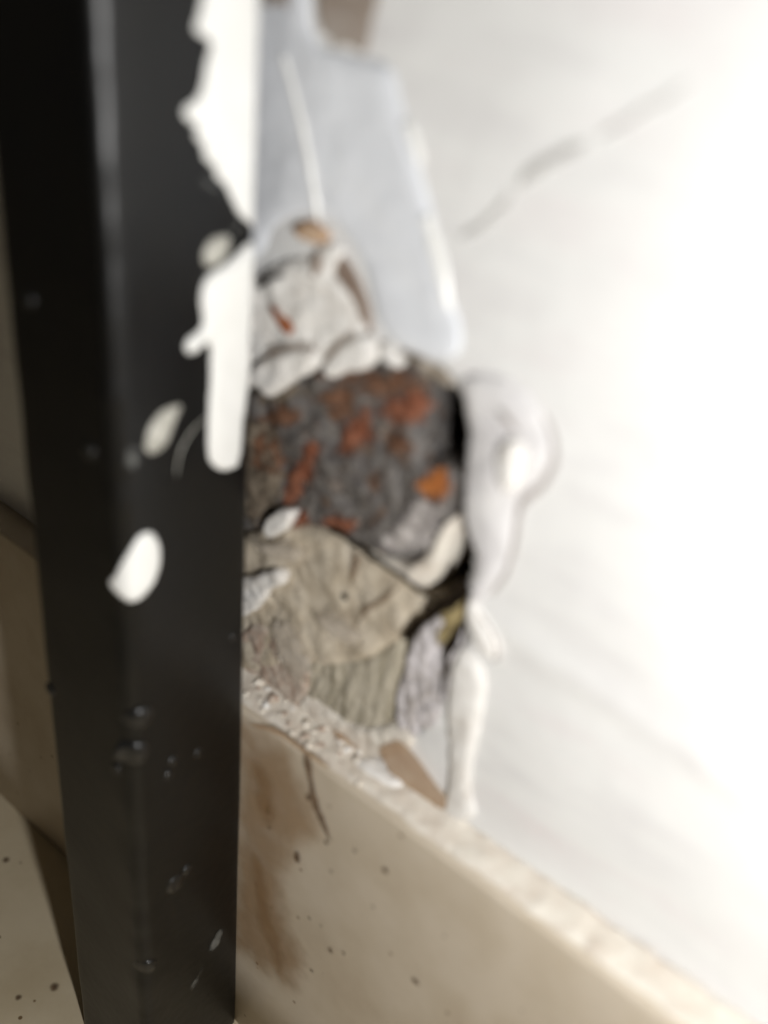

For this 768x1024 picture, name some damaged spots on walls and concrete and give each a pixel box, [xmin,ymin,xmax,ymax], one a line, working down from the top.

peeling [249,219,470,442]
rust [323,371,379,385]
rust [338,389,436,455]
rust [283,440,319,528]
rust [415,467,451,501]
hole [242,504,475,756]